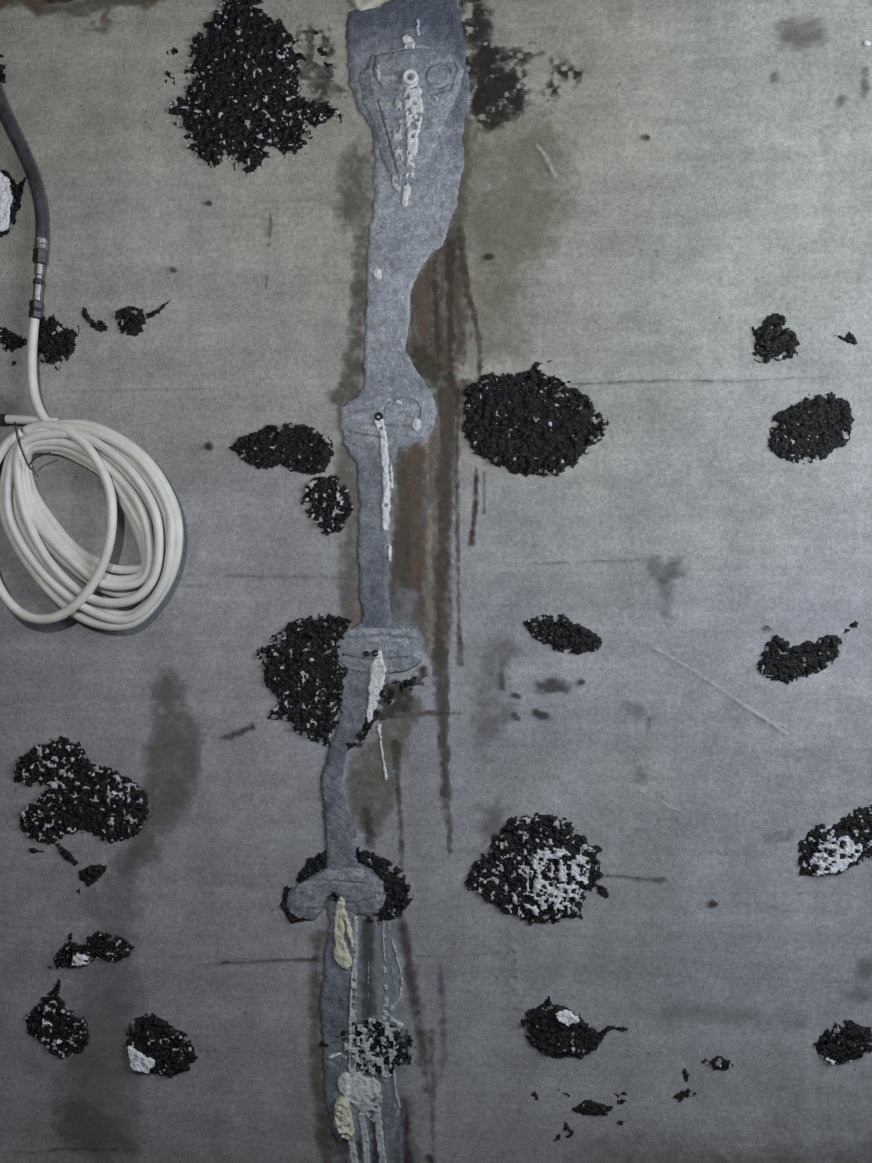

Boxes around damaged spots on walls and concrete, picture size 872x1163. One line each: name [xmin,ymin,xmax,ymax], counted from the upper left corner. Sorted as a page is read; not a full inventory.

corrosion [388,225,483,658]